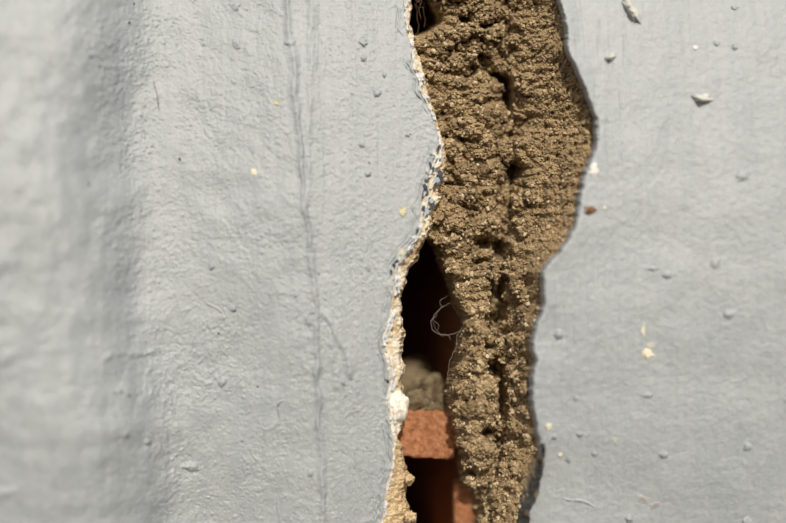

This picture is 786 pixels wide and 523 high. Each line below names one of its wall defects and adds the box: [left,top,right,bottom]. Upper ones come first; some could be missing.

peeling [421,144,444,215]
peeling [390,224,423,275]